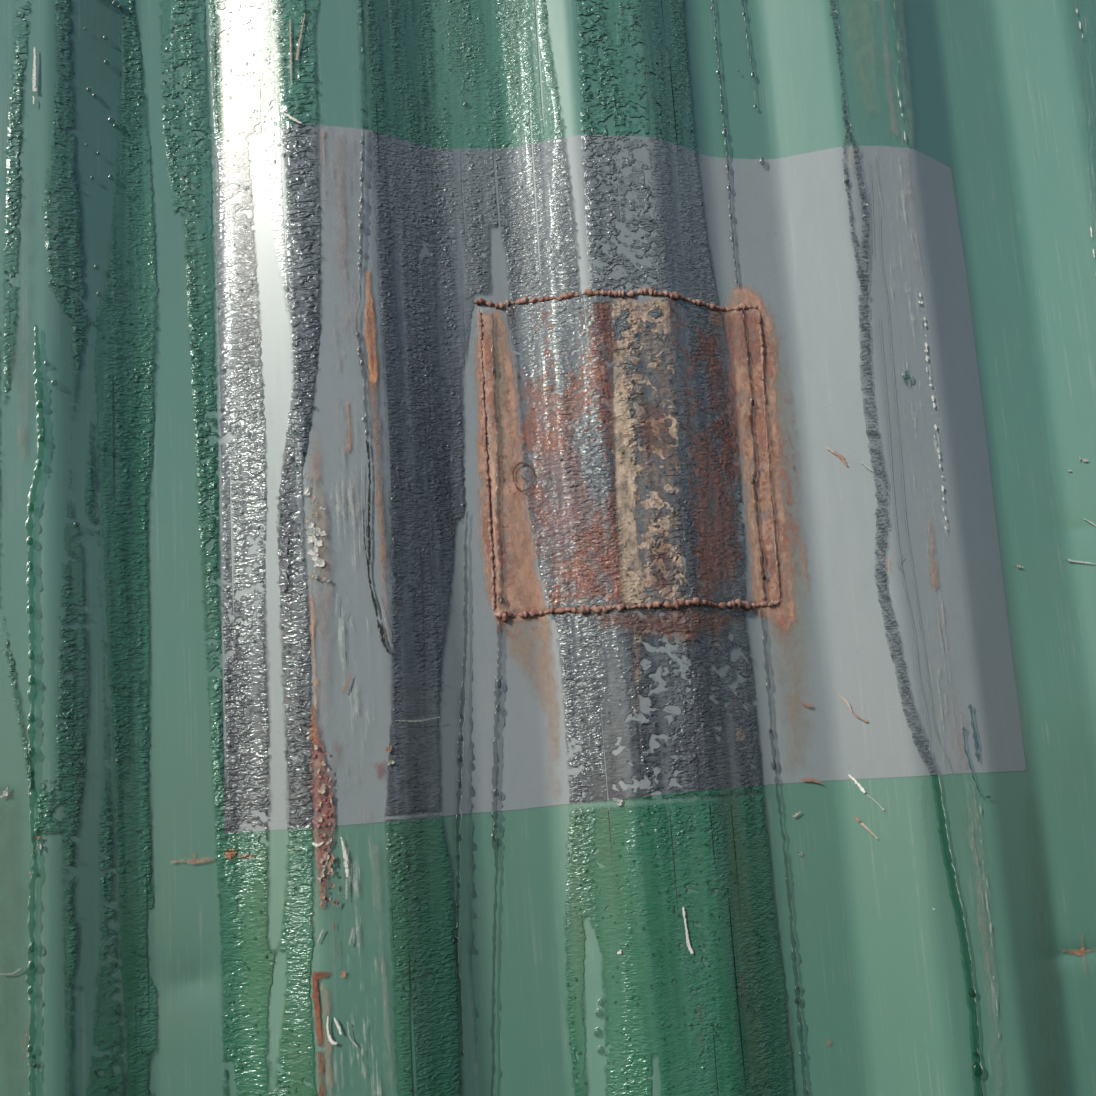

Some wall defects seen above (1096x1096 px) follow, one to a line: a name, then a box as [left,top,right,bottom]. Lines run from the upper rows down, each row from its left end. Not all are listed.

peeling [304,473,330,582]
rust [365,271,386,559]
rust [476,287,805,642]
rust [310,598,335,908]
rust [312,971,346,1096]